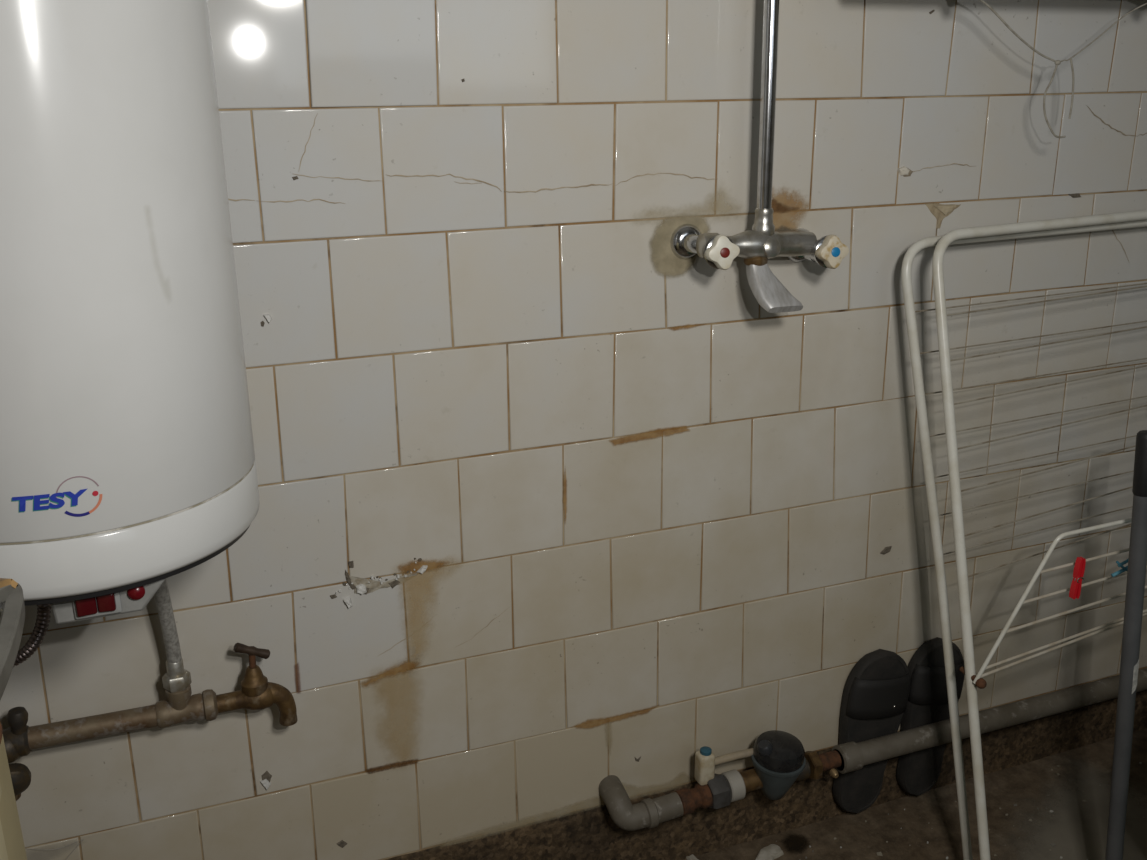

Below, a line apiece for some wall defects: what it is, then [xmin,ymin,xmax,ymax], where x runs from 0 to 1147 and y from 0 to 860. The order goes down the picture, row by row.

crack [228,115,712,204]
leakage [651,195,730,276]
rust [611,426,689,445]
spalling [330,558,428,609]
rust [575,707,655,745]